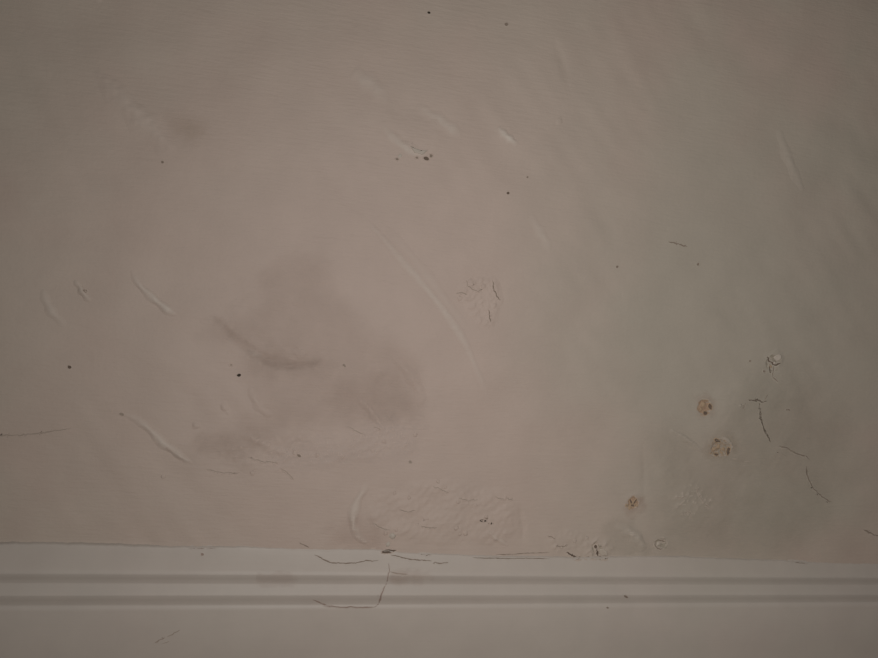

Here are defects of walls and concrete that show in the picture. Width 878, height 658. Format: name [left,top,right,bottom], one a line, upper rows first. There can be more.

crack [739,395,771,442]
crack [299,542,448,610]